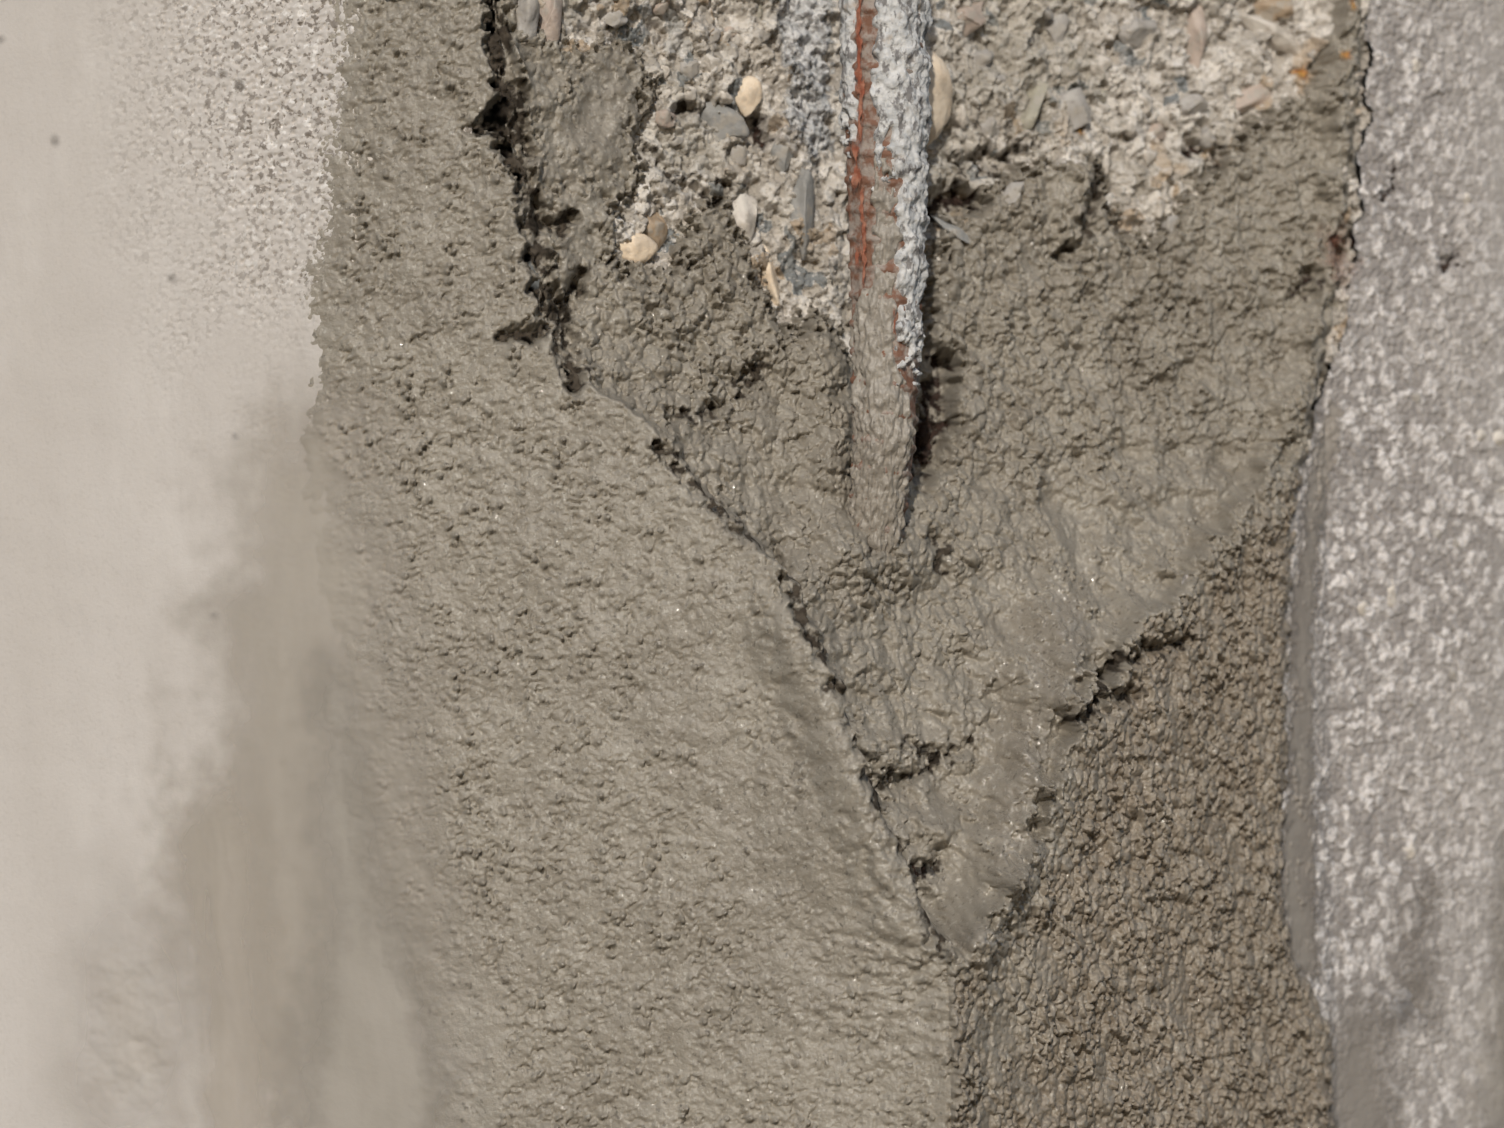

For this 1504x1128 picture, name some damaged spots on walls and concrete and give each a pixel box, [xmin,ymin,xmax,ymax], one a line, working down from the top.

crack [464,0,591,391]
spalling [515,0,853,364]
corrosion [849,0,867,285]
spalling [923,0,1371,401]
crack [652,361,847,695]
crack [905,523,952,576]
crack [1061,631,1197,727]
crack [853,734,974,959]